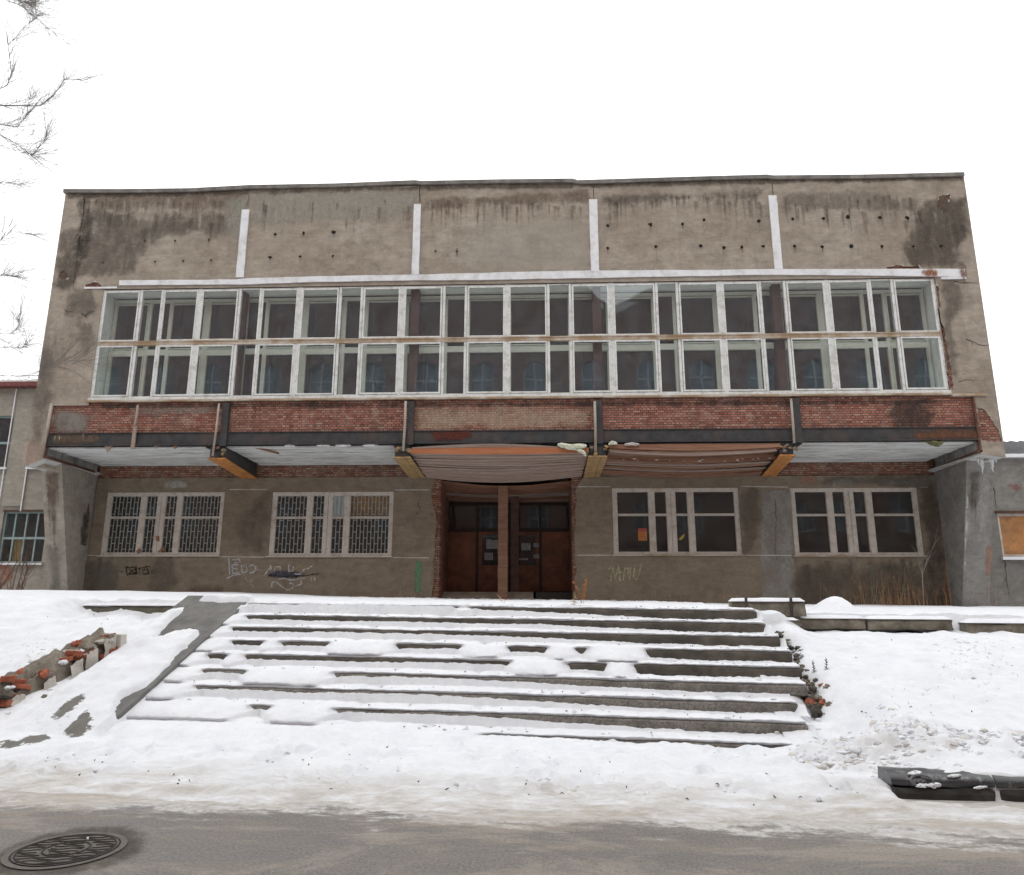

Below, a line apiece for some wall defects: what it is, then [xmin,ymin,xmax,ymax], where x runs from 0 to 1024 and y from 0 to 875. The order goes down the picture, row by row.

damp [57,188,417,289]
damp [904,198,967,266]
spalling [976,408,1001,442]